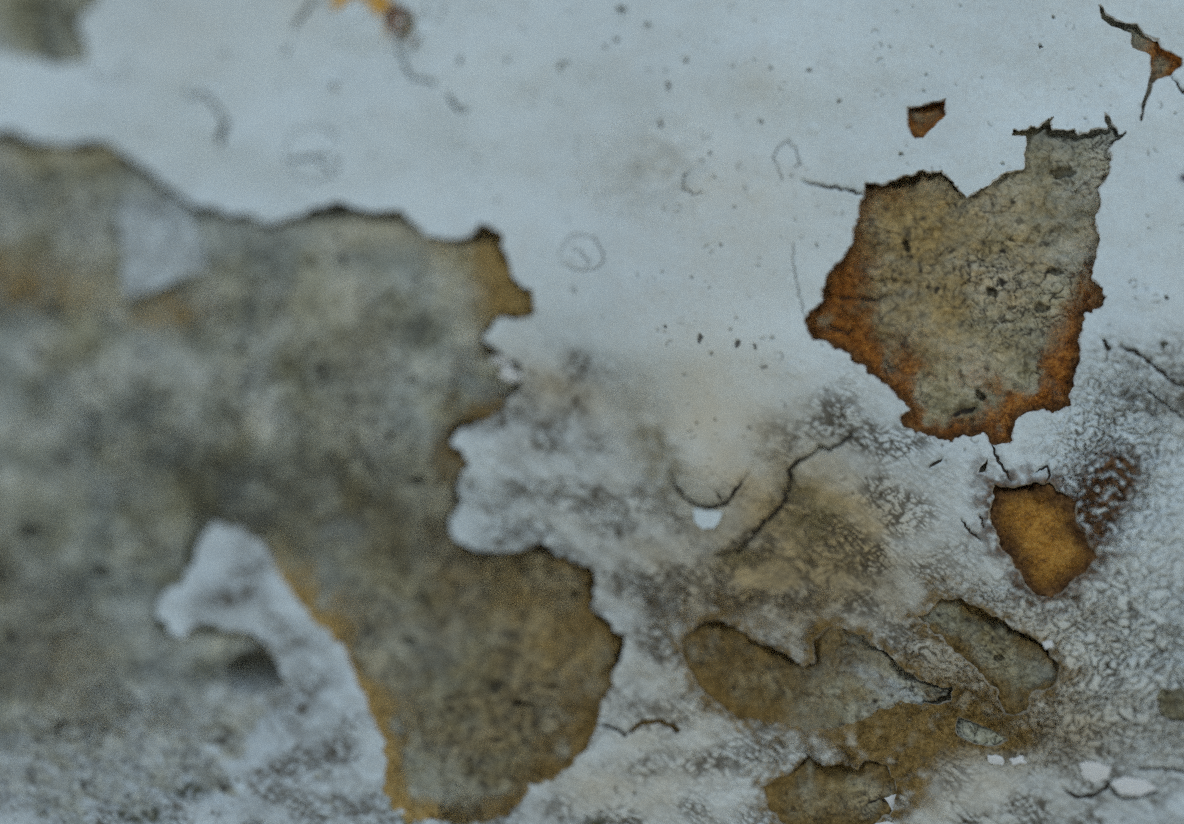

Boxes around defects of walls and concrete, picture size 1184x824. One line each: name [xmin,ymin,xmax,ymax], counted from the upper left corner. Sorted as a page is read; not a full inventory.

peeling [0,0,98,65]
rust [366,0,406,36]
peeling [906,98,947,139]
peeling [803,112,1127,446]
rust [804,244,1102,445]
peeling [0,128,625,824]
rust [982,452,1138,602]
peeling [679,619,953,731]
peeling [918,598,1061,716]
peeling [762,755,897,824]
peeling [955,716,1028,765]